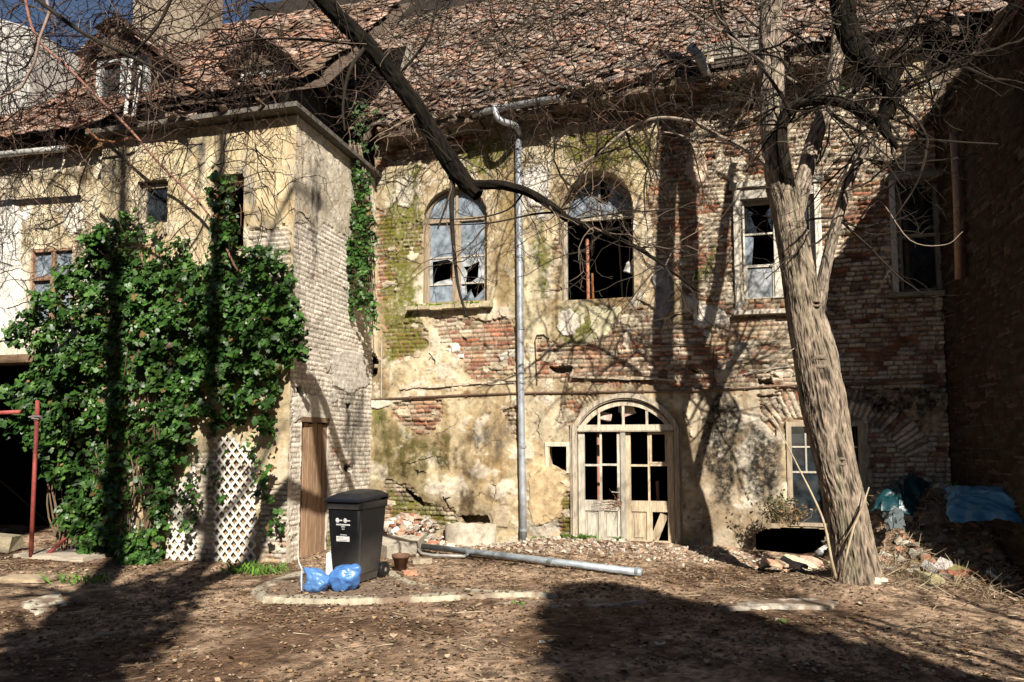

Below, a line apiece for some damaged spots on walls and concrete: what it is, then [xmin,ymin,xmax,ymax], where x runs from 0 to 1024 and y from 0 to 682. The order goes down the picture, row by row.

flaking render [247,123,518,564]
damp [378,413,450,477]
flaking render [536,93,803,438]
flaking render [788,92,818,178]
flaking render [813,93,951,496]